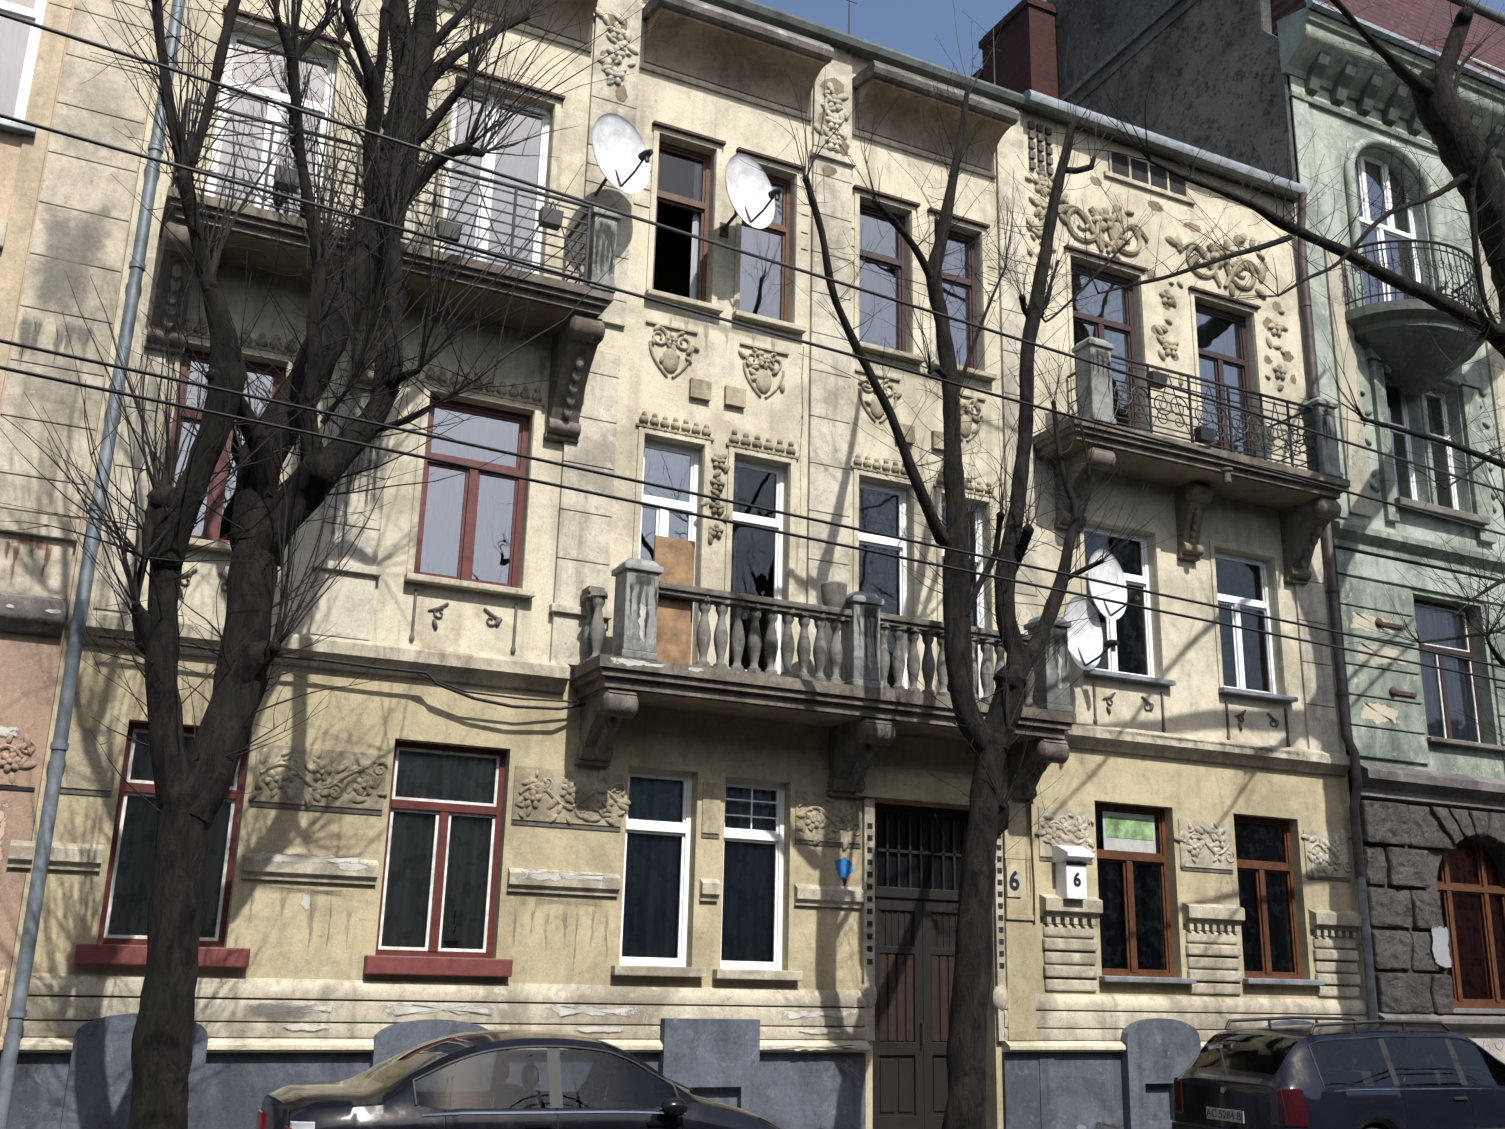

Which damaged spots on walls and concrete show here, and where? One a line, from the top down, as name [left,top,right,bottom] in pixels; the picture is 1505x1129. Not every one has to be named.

corrosion [5,538,51,575]
peeling [0,800,12,873]